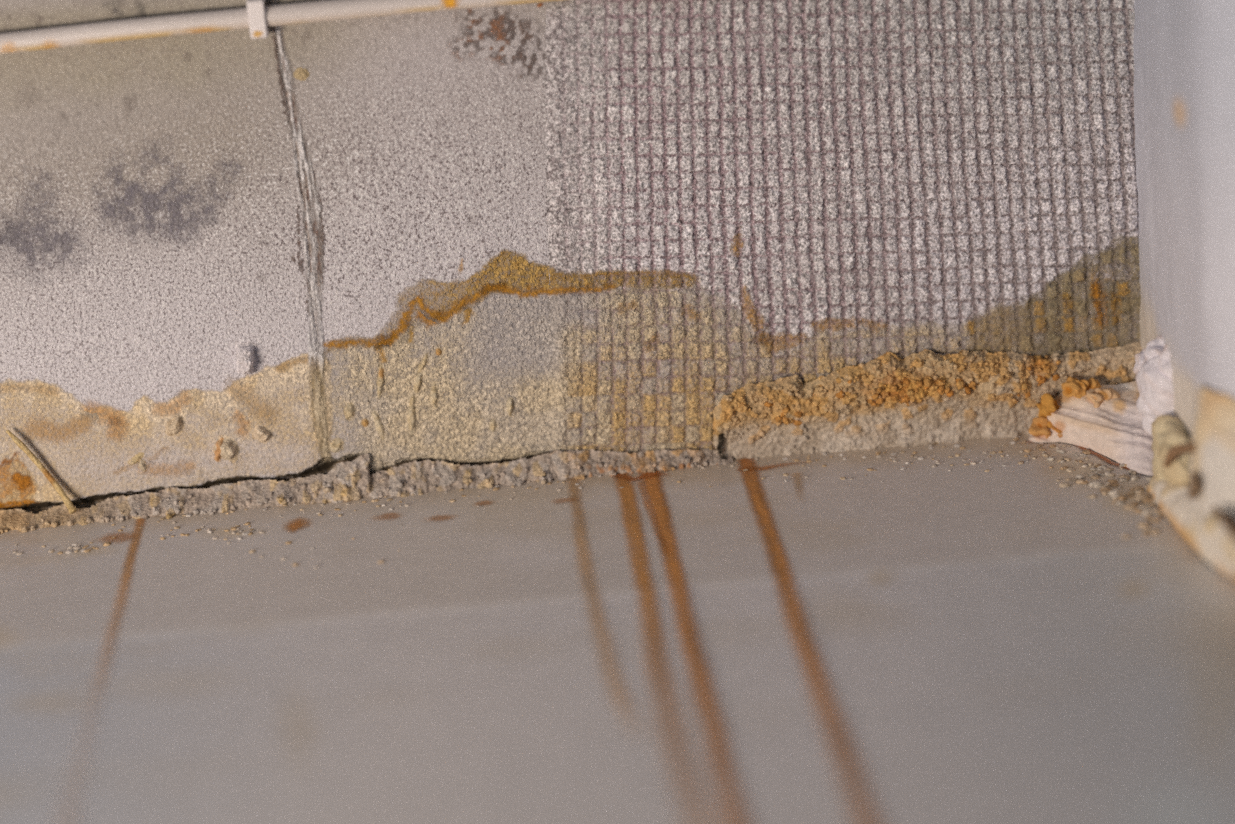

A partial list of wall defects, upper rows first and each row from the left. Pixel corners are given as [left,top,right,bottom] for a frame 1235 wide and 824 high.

damp [1,209,76,262]
damp [104,170,215,238]
crack [4,0,539,508]
corrosion [0,453,37,508]
corrosion [105,519,144,592]
spalling [0,335,1235,534]
corrosion [614,470,743,824]
corrosion [739,458,855,769]